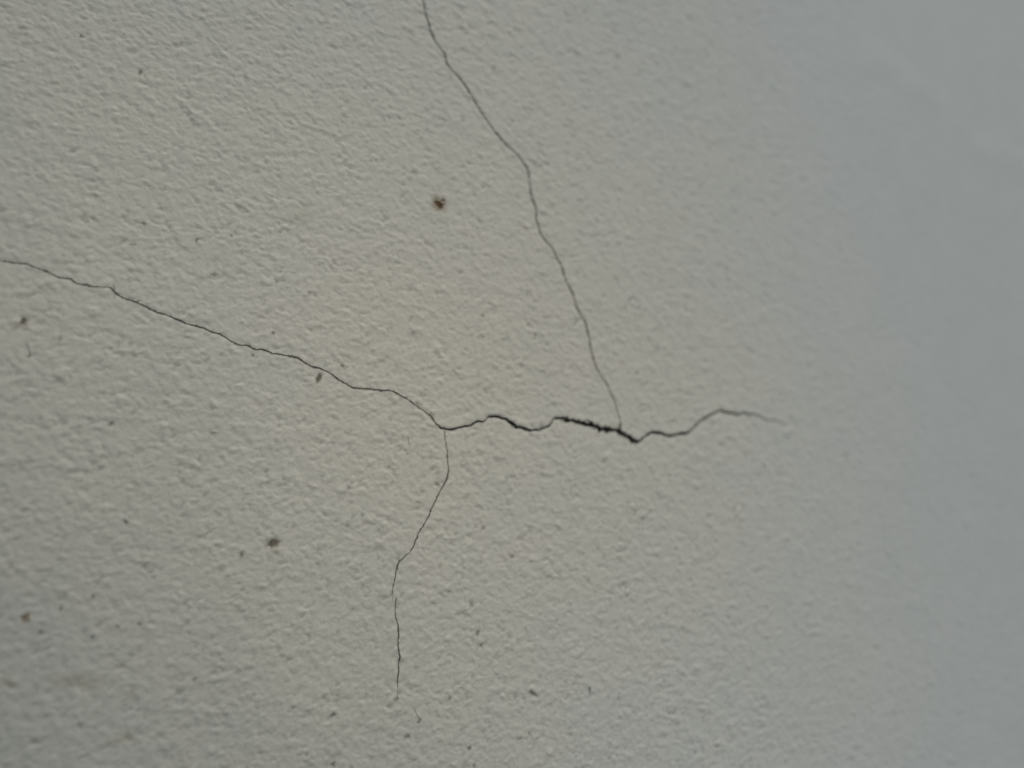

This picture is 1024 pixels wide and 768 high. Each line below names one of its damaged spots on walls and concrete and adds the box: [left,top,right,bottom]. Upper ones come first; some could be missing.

crack [2,0,765,686]